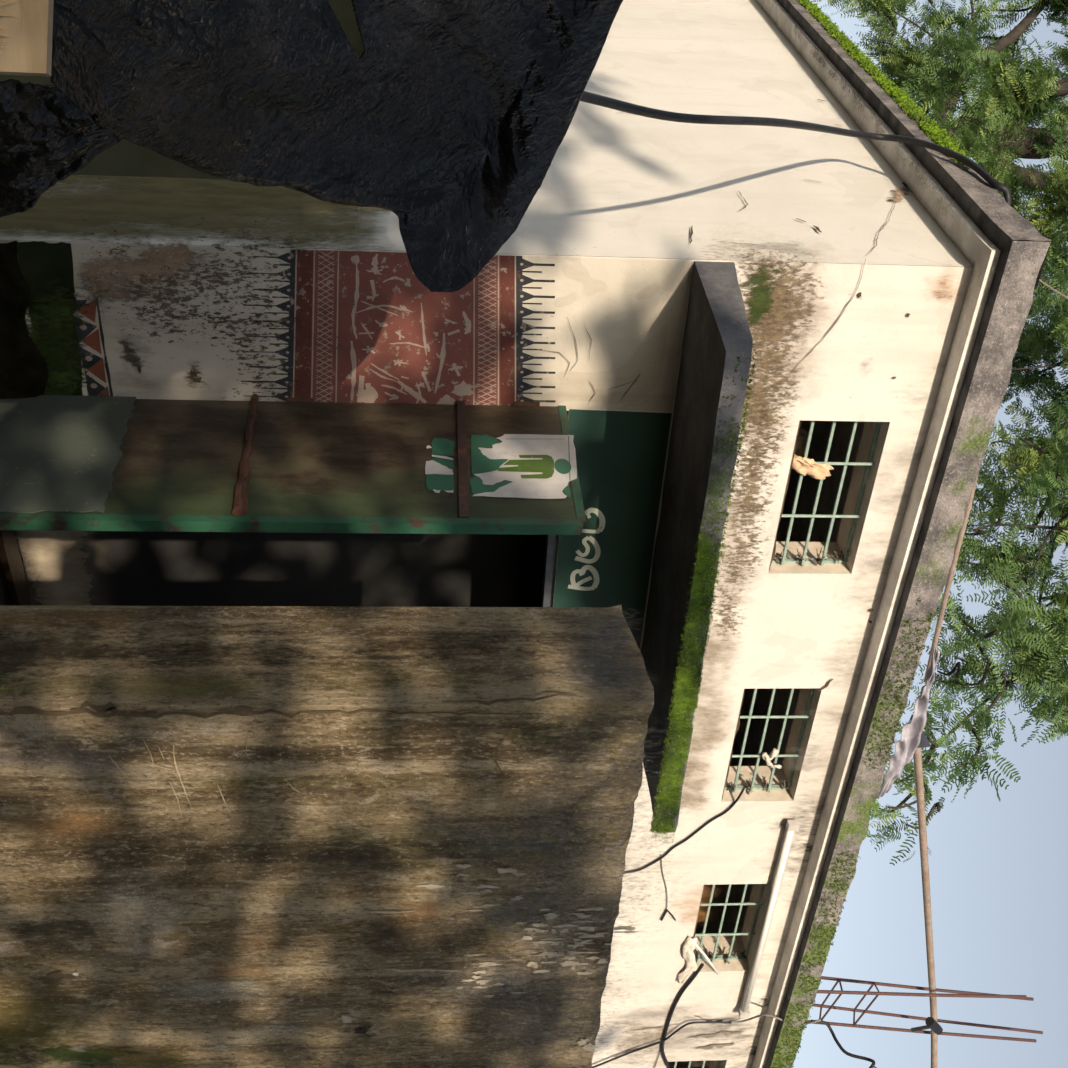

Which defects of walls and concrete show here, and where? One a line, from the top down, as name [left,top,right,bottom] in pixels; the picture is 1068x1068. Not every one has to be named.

water stain [72,216,313,401]
crack [789,202,896,376]
water stain [713,247,823,635]
crack [0,693,583,778]
peeling [466,868,526,911]
peeling [455,954,526,998]
peeling [516,907,639,975]